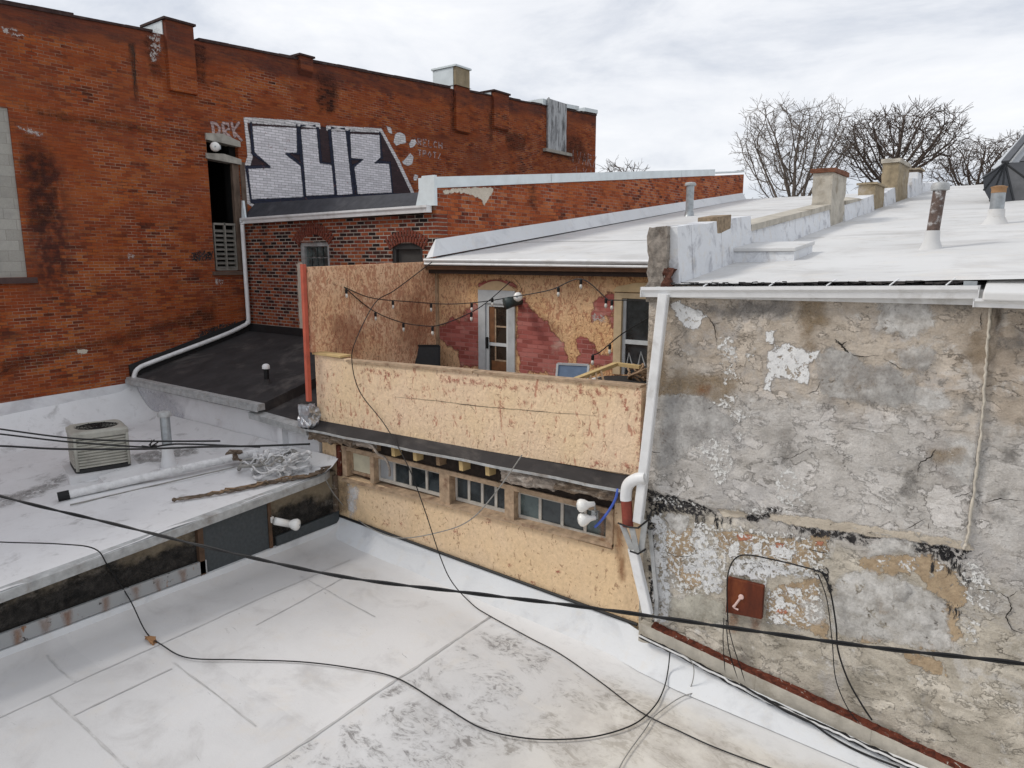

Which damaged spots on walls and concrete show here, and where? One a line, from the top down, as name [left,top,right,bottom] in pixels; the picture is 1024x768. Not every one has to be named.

spalling [439,303,529,404]
spalling [478,278,614,388]
peeling [669,300,707,330]
peeling [763,330,820,392]
crack [835,339,904,369]
water stain [745,507,777,523]
peeling [650,466,996,644]
water stain [794,524,880,545]
water stain [913,542,971,562]
mould [0,545,197,631]
crack [978,589,1018,632]
spalling [904,643,947,677]